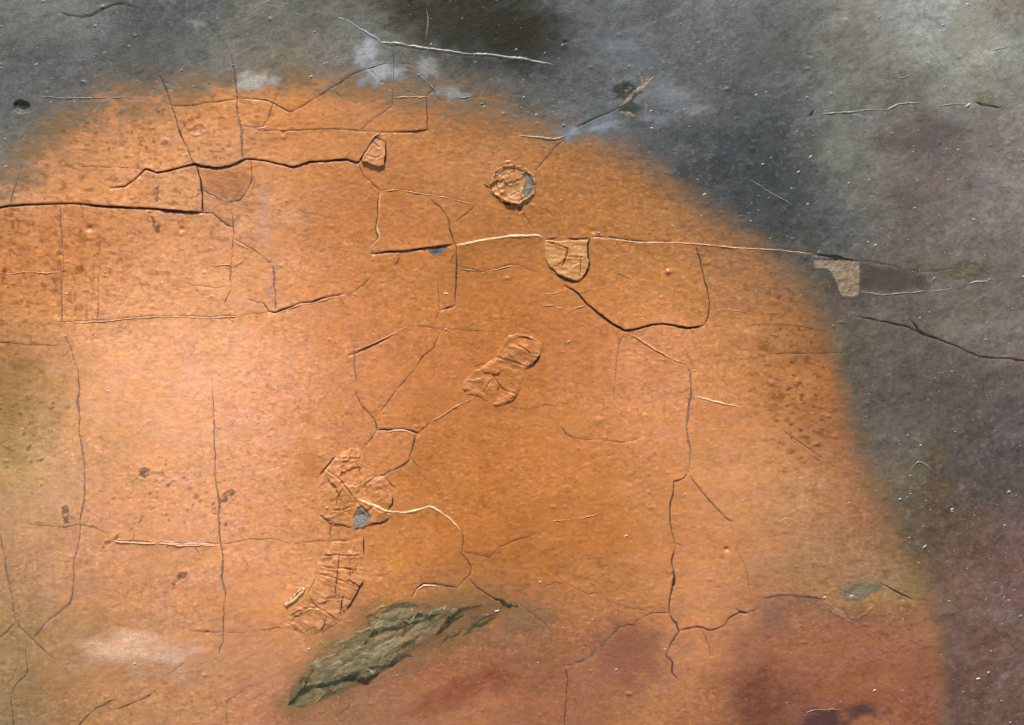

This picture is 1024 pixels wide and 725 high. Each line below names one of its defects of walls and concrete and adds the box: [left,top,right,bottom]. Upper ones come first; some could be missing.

crack [537,108,618,168]
crack [809,102,999,116]
peeling [544,237,591,283]
peeling [813,259,860,297]
crack [0,9,560,725]
crack [511,404,638,443]
crack [545,236,1024,725]
peeling [284,448,396,635]